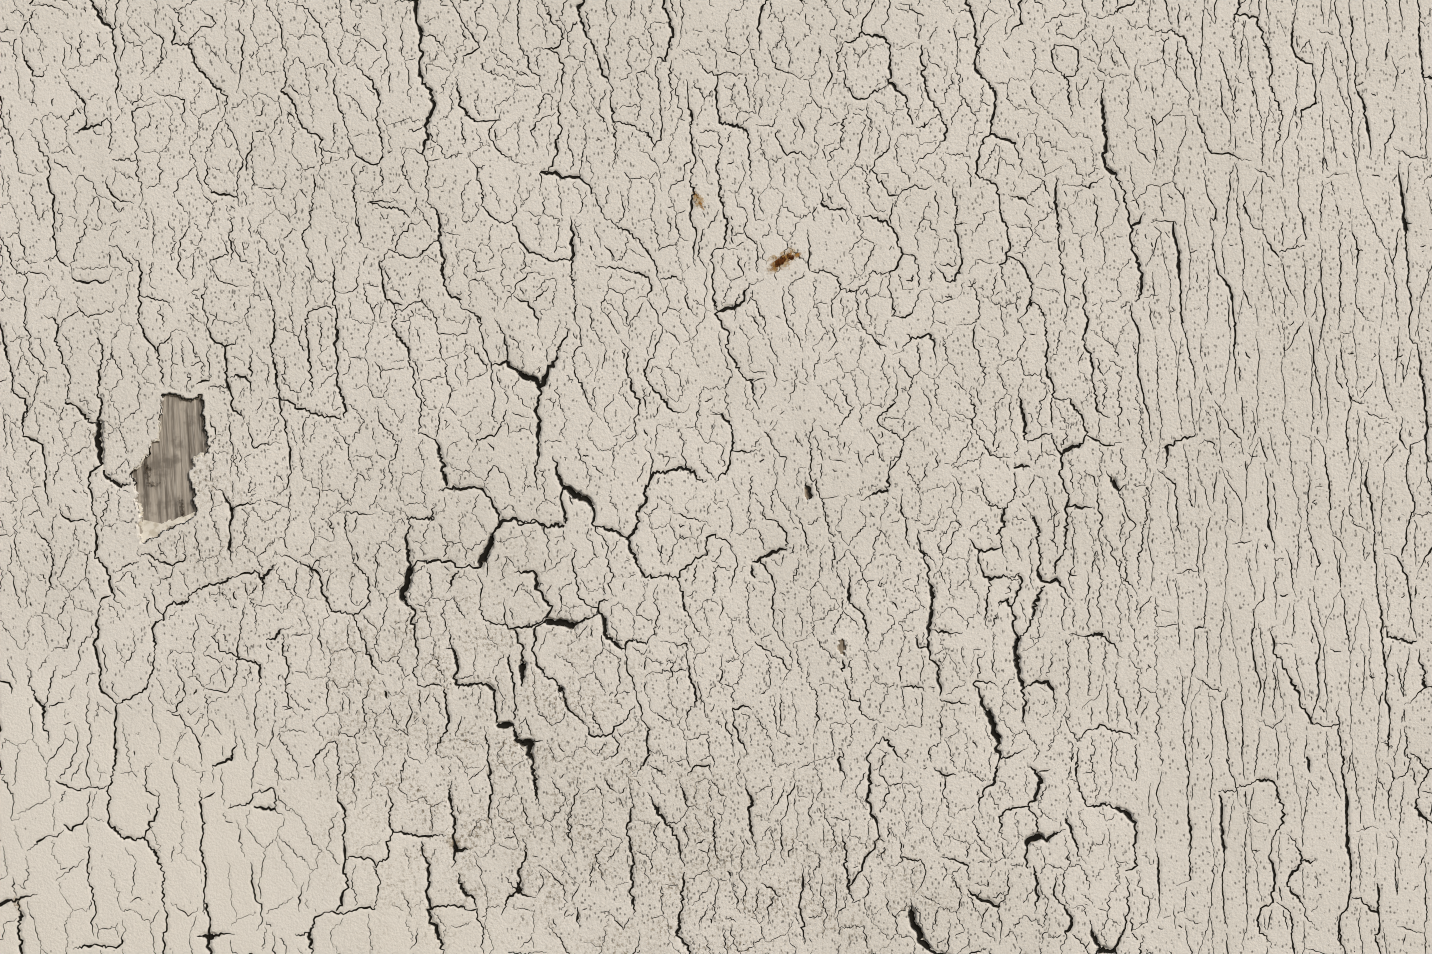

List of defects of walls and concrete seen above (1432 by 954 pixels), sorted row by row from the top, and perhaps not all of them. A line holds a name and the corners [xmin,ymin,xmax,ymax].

crack [1385,0,1412,88]
crack [793,116,805,145]
crack [1384,110,1395,165]
crack [1320,173,1345,228]
crack [1200,266,1210,373]
crack [1155,336,1163,438]
peeling [130,392,211,544]
crack [575,444,604,488]
crack [1303,735,1311,772]
crack [125,847,149,904]
crack [1389,782,1408,895]
crack [1401,854,1428,954]